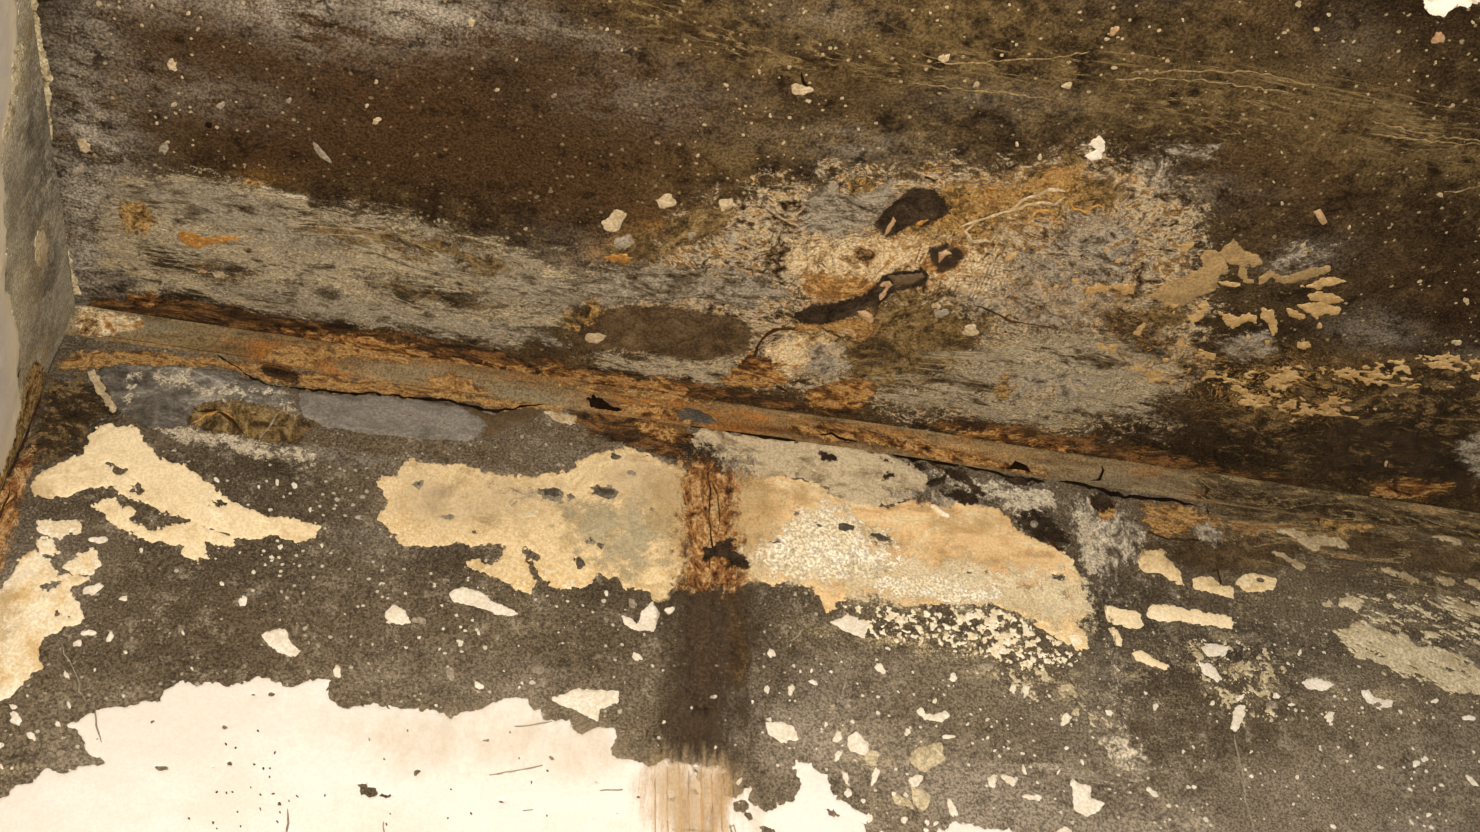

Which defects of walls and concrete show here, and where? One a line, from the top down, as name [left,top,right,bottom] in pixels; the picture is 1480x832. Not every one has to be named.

leakage [1116,69,1319,92]
leakage [25,369,121,465]
leakage [75,306,146,337]
peeling [0,423,323,741]
peeling [376,446,699,615]
rust [0,291,1311,600]
leakage [90,131,1480,736]
peeling [727,476,1302,735]
peeling [1095,238,1480,423]
rust [1369,476,1456,502]
peeling [0,664,883,832]
leakage [652,573,760,832]